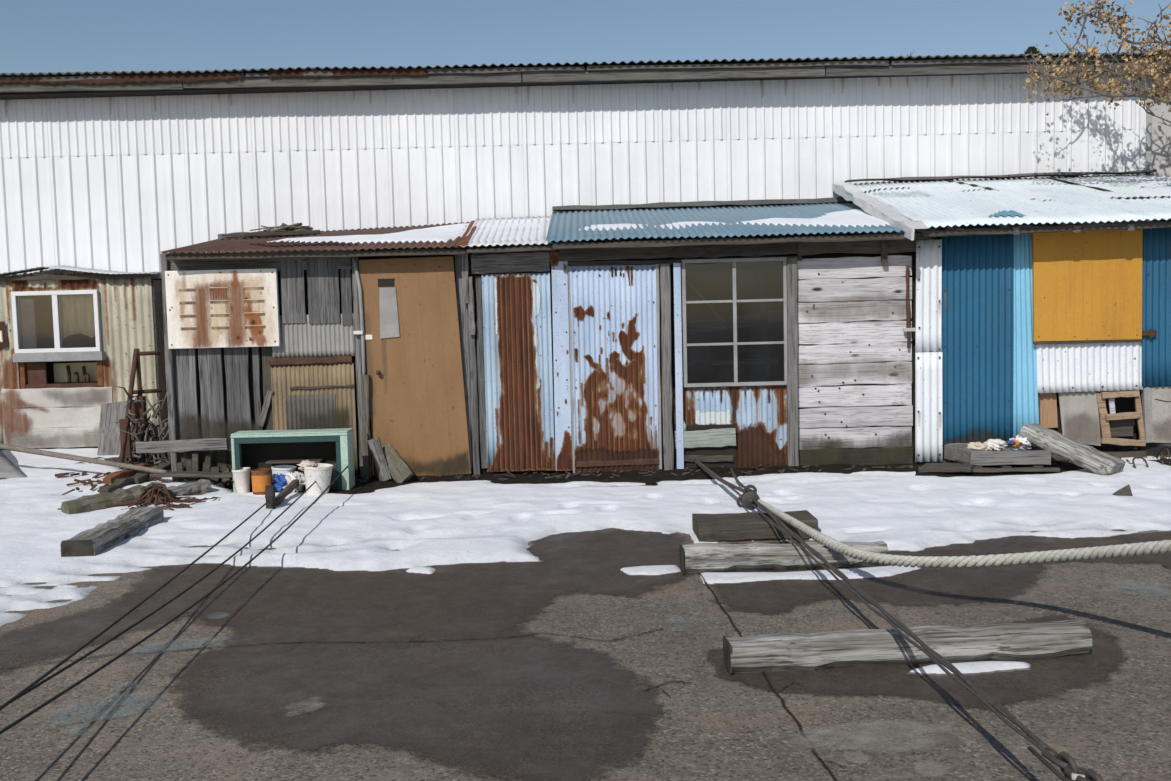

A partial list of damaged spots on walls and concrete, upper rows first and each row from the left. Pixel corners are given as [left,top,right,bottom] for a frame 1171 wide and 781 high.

corrosion [550,251,567,271]
corrosion [180,272,266,348]
corrosion [0,272,135,433]
corrosion [487,273,659,473]
corrosion [673,385,788,468]
crack [697,572,742,637]
crack [762,672,844,781]